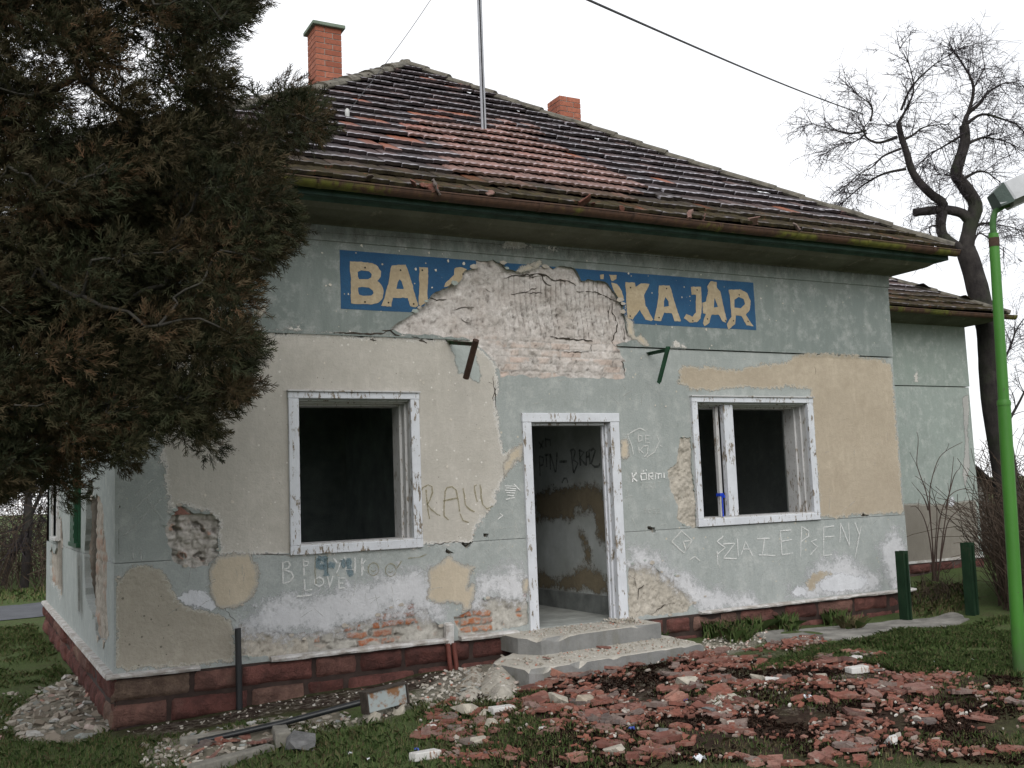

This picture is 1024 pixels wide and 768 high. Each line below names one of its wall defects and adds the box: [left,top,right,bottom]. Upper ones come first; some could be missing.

crack [430,273,625,374]
peeling [86,241,649,673]
flaking render [668,436,698,528]
peeling [677,352,980,562]
leakage [240,563,447,642]
flaking render [628,559,706,618]
efflorescence [786,526,907,598]